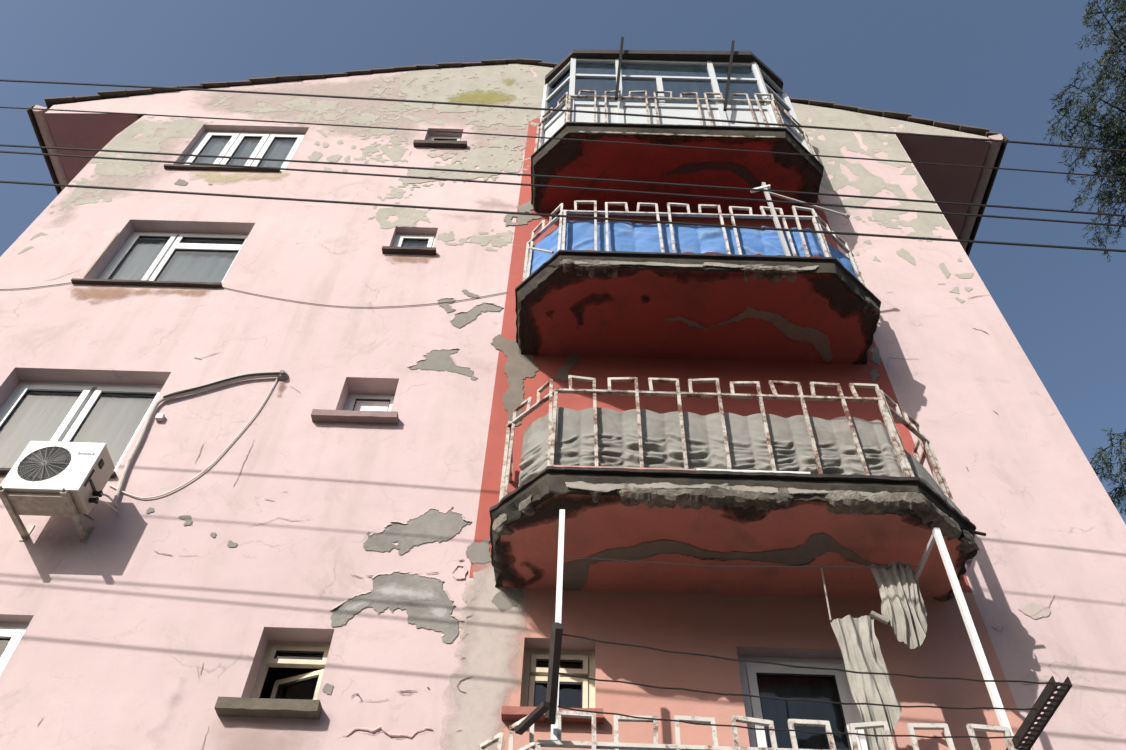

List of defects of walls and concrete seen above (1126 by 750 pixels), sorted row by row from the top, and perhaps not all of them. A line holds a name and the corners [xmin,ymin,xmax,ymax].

peeling [49,117,213,214]
peeling [211,64,551,229]
spalling [666,162,763,193]
peeling [791,103,987,266]
peeling [437,200,541,251]
spalling [560,259,819,284]
peeling [408,348,478,380]
spalling [665,306,834,364]
spalling [330,481,977,643]